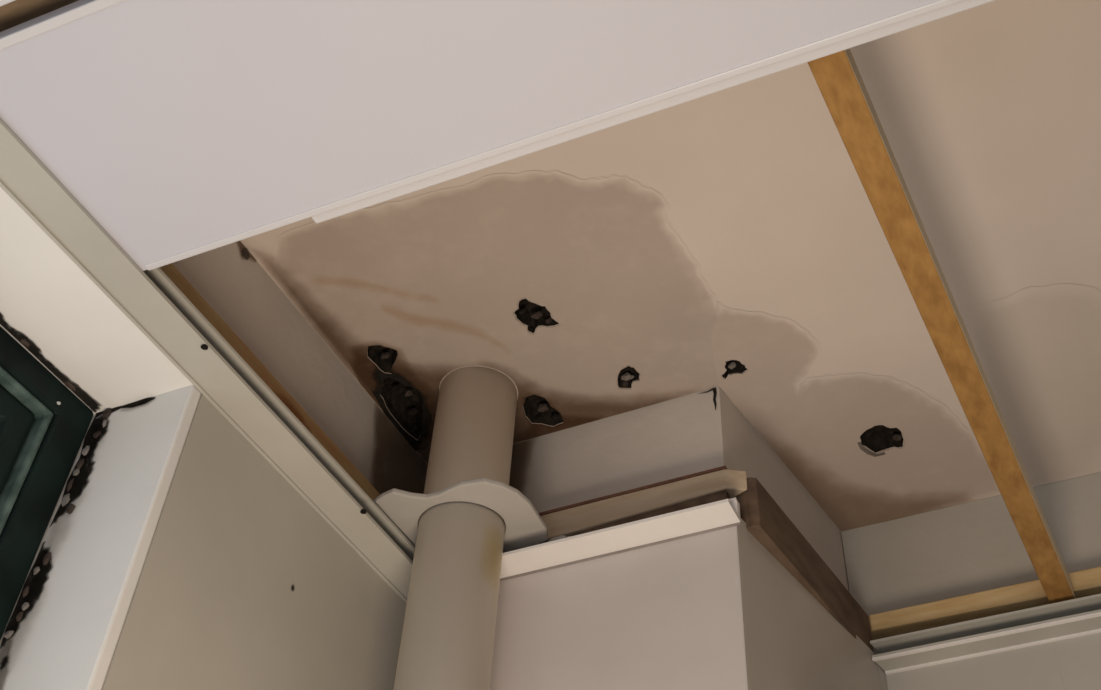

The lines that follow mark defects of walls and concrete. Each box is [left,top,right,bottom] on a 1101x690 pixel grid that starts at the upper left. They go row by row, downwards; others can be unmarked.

leakage [267,170,1001,531]